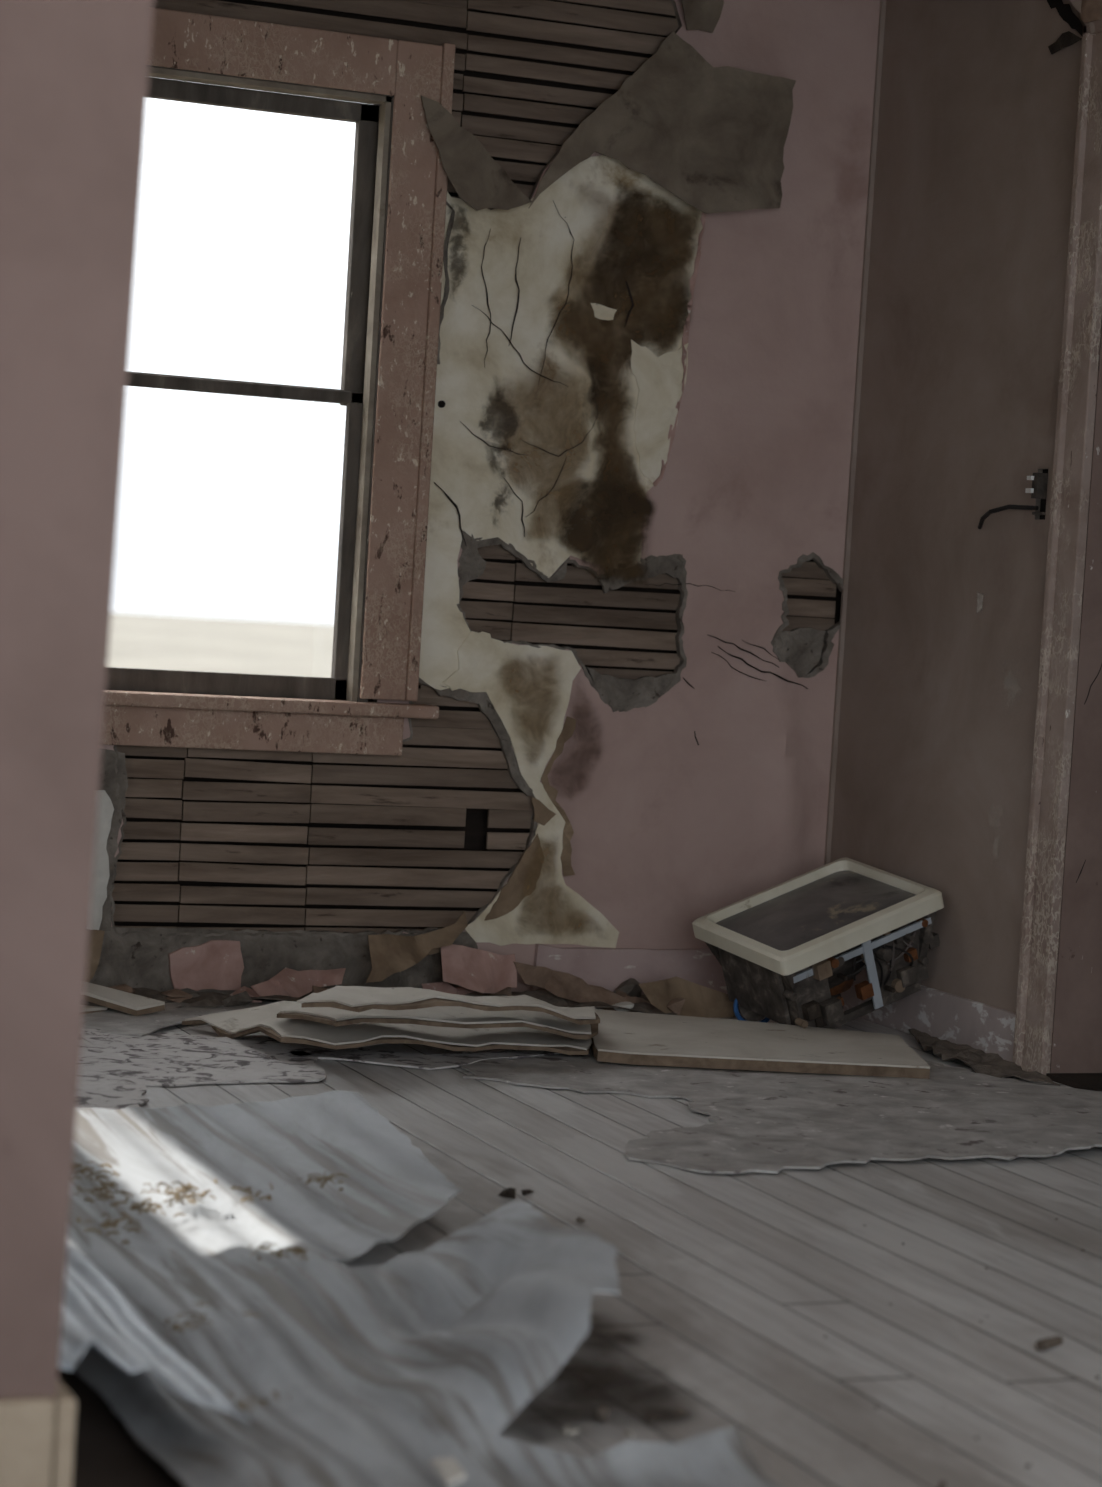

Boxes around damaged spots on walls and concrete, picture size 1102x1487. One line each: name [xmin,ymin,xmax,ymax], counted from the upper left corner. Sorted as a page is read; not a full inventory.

peeling [1047,0,1102,54]
leakage [451,209,468,280]
leakage [481,188,693,581]
peeling [86,0,724,996]
flaking render [771,552,843,678]